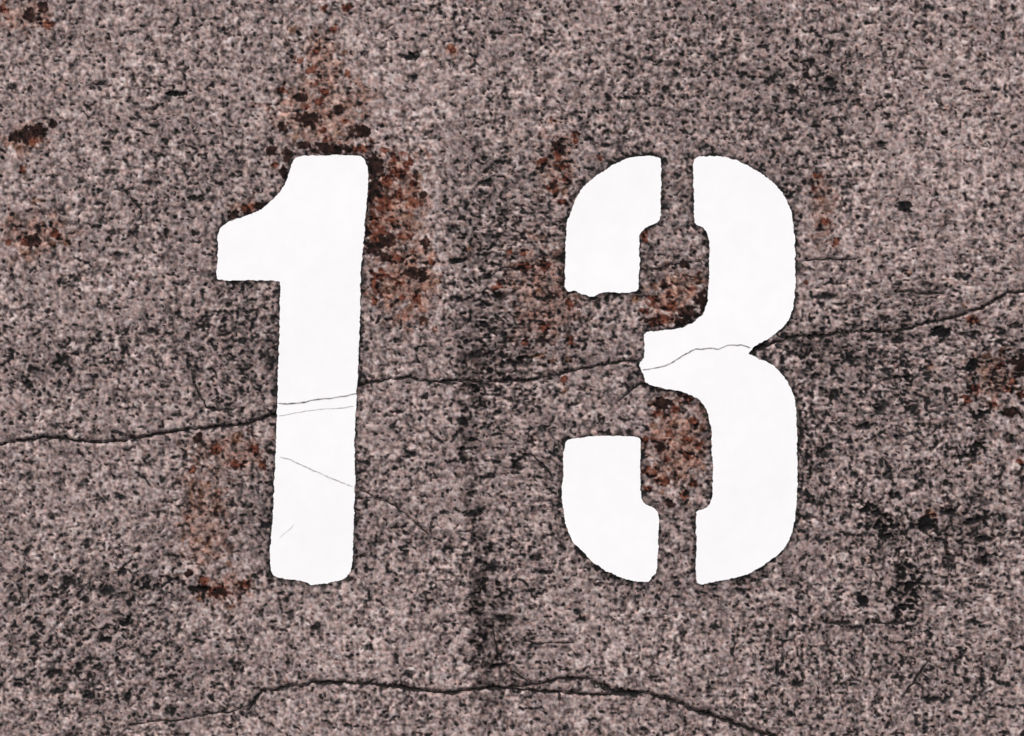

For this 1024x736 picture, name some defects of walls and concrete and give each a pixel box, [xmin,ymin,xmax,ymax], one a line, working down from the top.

corrosion [0,119,57,173]
corrosion [227,198,267,219]
corrosion [257,23,445,339]
corrosion [631,261,708,328]
crack [0,290,1024,446]
corrosion [640,391,711,508]
crack [131,621,775,736]